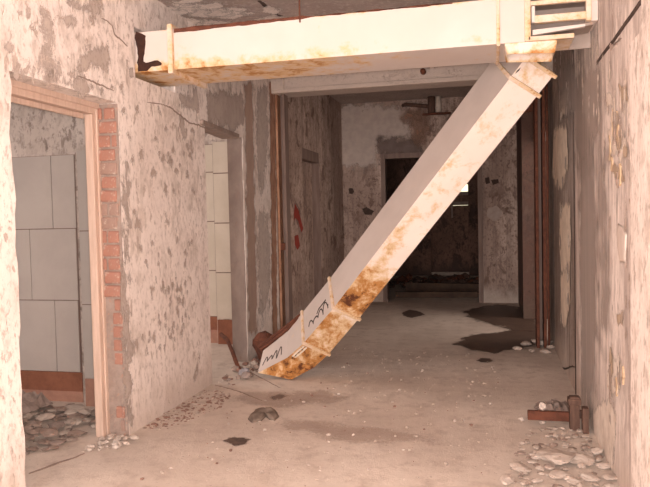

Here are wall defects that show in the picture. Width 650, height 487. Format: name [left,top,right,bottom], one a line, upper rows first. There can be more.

corrosion [135,32,162,72]
crack [78,75,114,91]
crack [147,102,209,142]
flaking render [98,103,190,436]
damp [453,305,536,354]